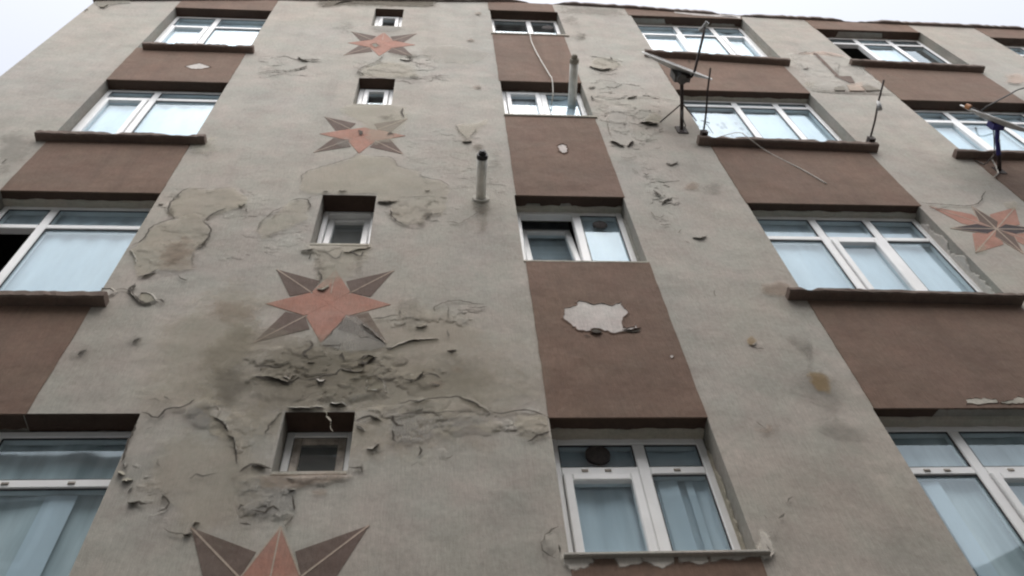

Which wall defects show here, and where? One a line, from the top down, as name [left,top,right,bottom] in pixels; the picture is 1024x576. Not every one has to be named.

flaking render [378,126,509,229]
flaking render [589,55,682,224]
flaking render [101,186,249,306]
flaking render [561,300,641,337]
flaking render [169,300,550,526]
spalling [965,396,1024,406]